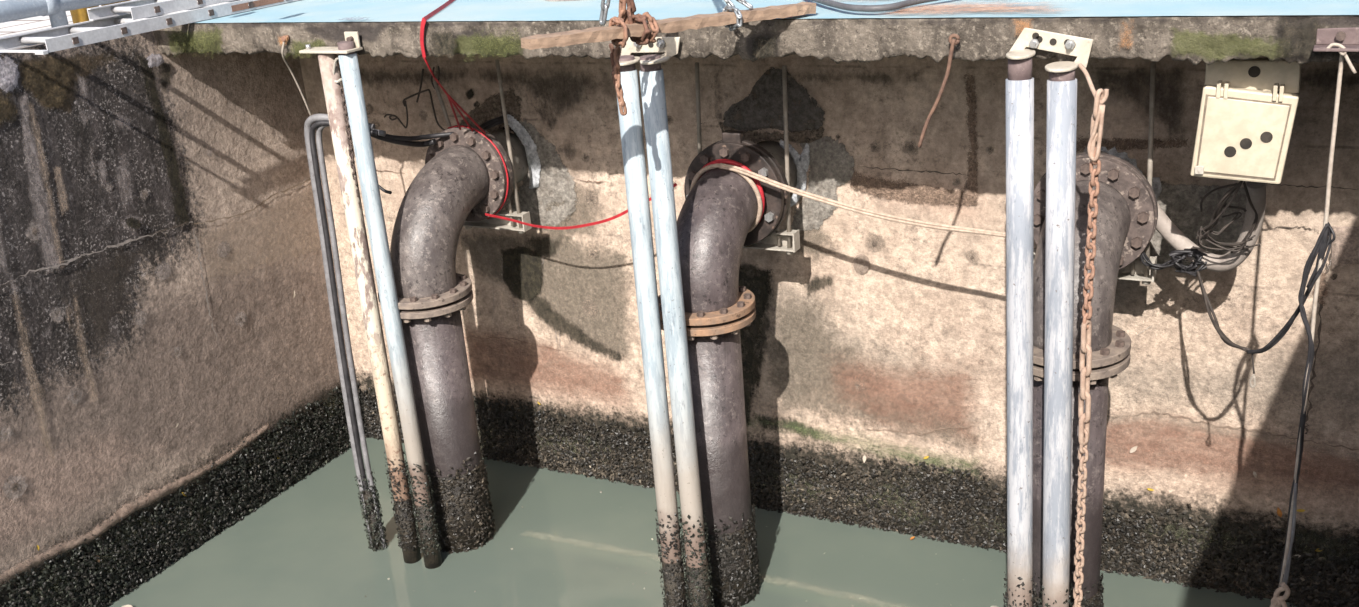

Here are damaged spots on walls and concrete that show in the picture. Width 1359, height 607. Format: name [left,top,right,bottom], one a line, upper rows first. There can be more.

leakage [20,97,68,271]
crack [1266,182,1356,190]
leakage [12,283,52,455]
crack [0,220,221,351]
crack [1262,226,1332,434]